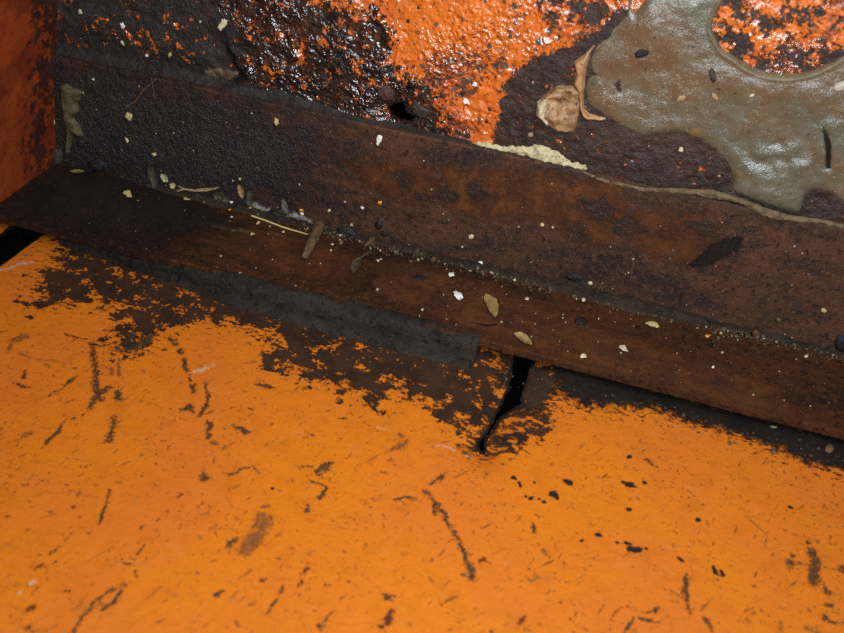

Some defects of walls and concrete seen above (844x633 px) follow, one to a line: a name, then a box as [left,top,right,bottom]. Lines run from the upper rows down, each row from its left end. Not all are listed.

corrosion [20,0,472,173]
spalling [387,99,417,124]
peeling [535,85,580,132]
corrosion [430,0,844,269]
corrosion [11,227,844,482]